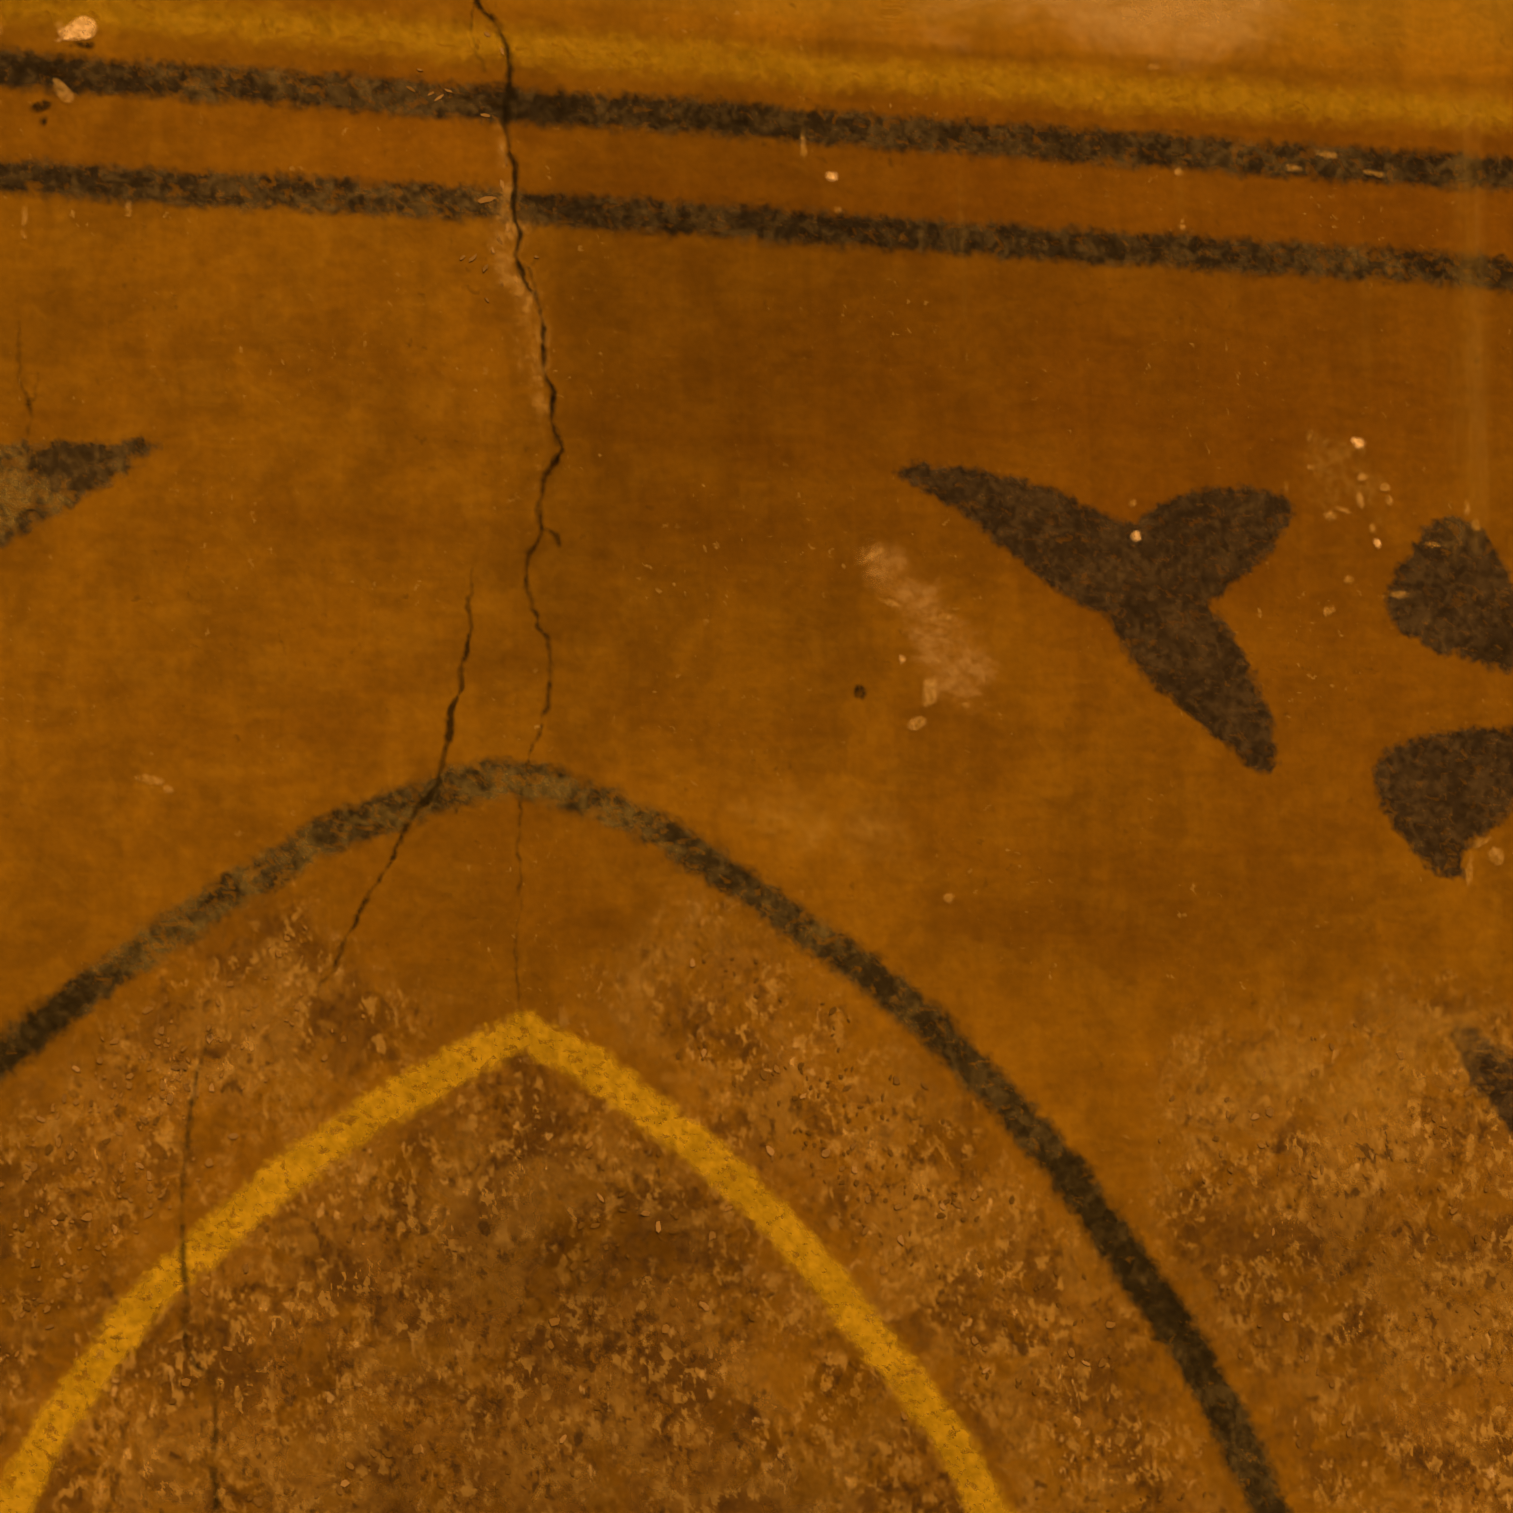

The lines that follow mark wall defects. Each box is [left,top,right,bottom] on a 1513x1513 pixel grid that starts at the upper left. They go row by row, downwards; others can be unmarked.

crack [406,0,563,463]
crack [352,634,470,929]